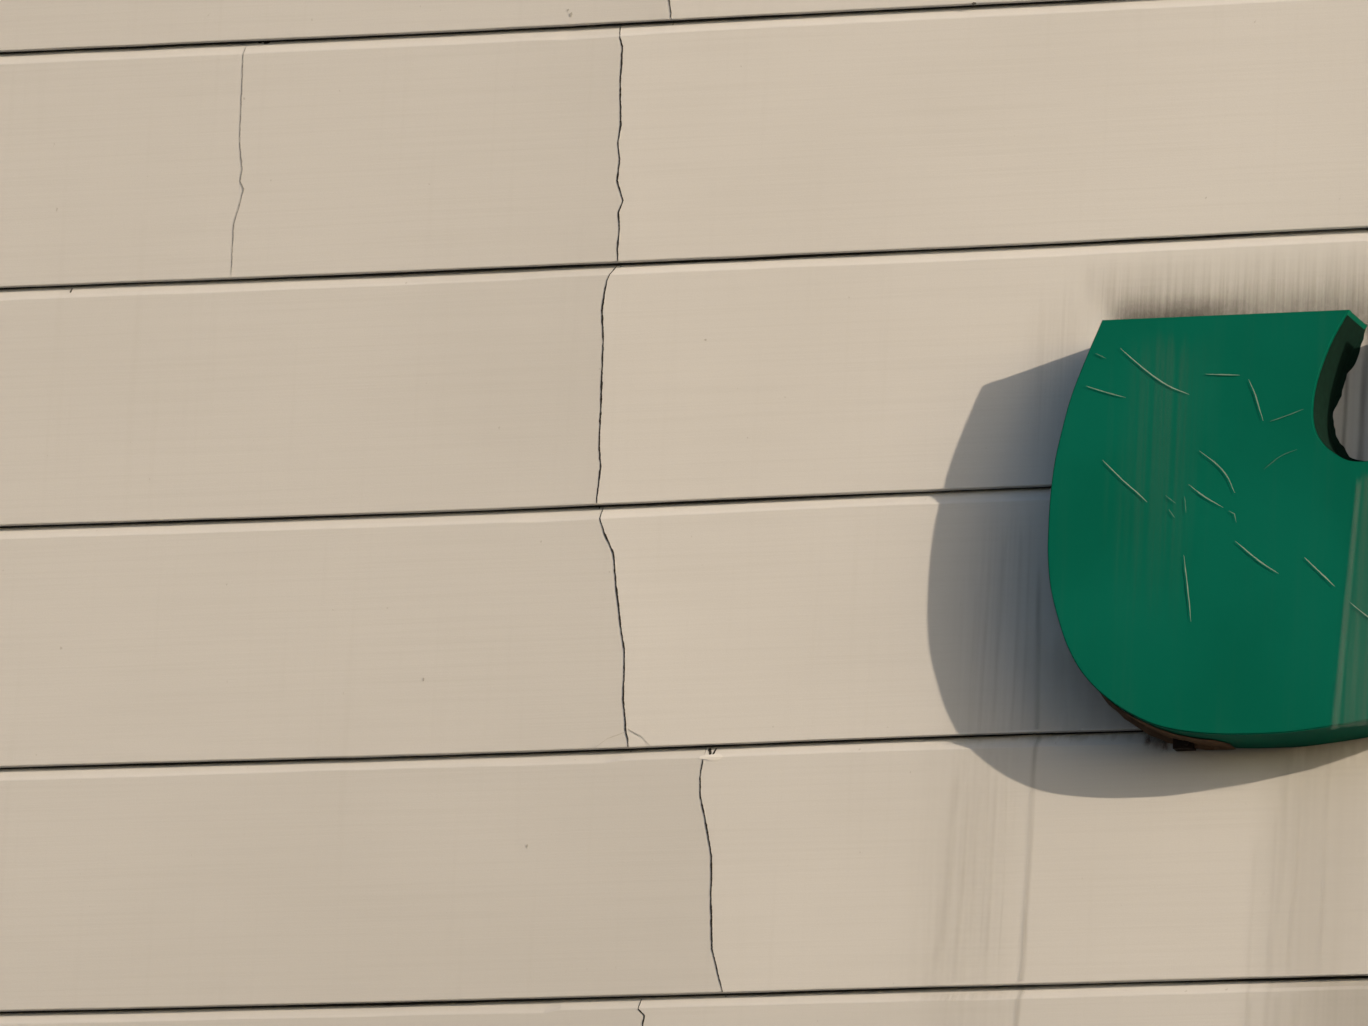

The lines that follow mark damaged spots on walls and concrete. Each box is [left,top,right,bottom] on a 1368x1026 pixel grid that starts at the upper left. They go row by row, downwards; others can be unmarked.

crack [231,47,246,271]
crack [596,28,650,747]
crack [699,760,726,997]